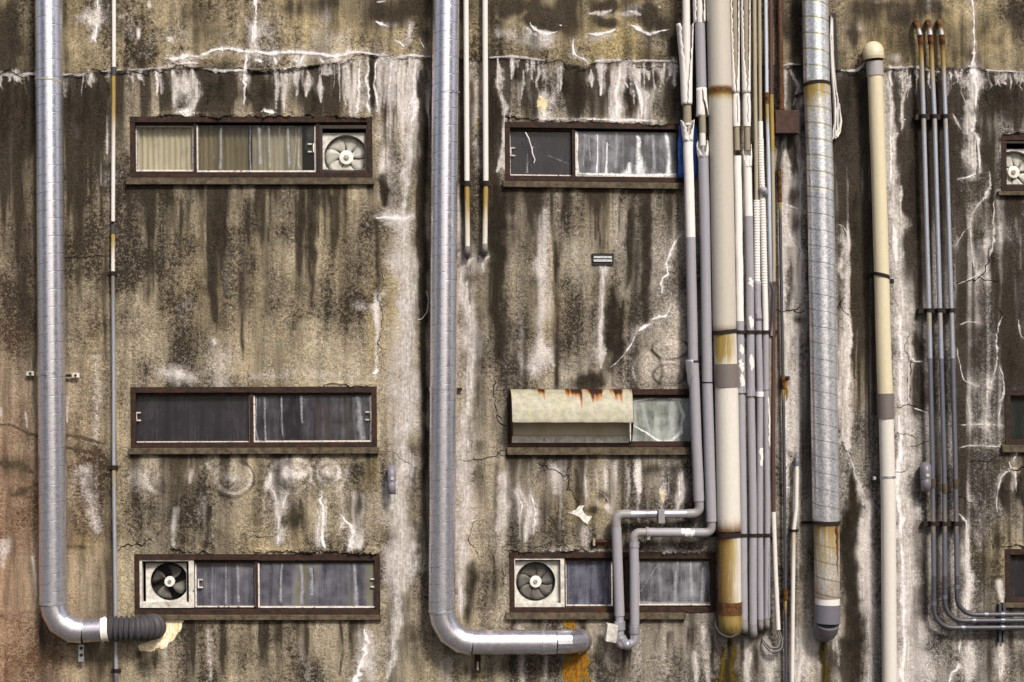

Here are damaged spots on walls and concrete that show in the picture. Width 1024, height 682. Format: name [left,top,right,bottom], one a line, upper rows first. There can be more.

leakage [63,72,110,123]
leakage [488,39,678,172]
leakage [782,154,803,302]
leakage [660,233,684,293]
crack [953,253,999,286]
leakage [131,0,430,682]
leakage [581,265,671,383]
leakage [794,225,874,682]
leakage [495,478,537,542]
corrosion [560,619,577,629]
corrosion [561,651,591,682]